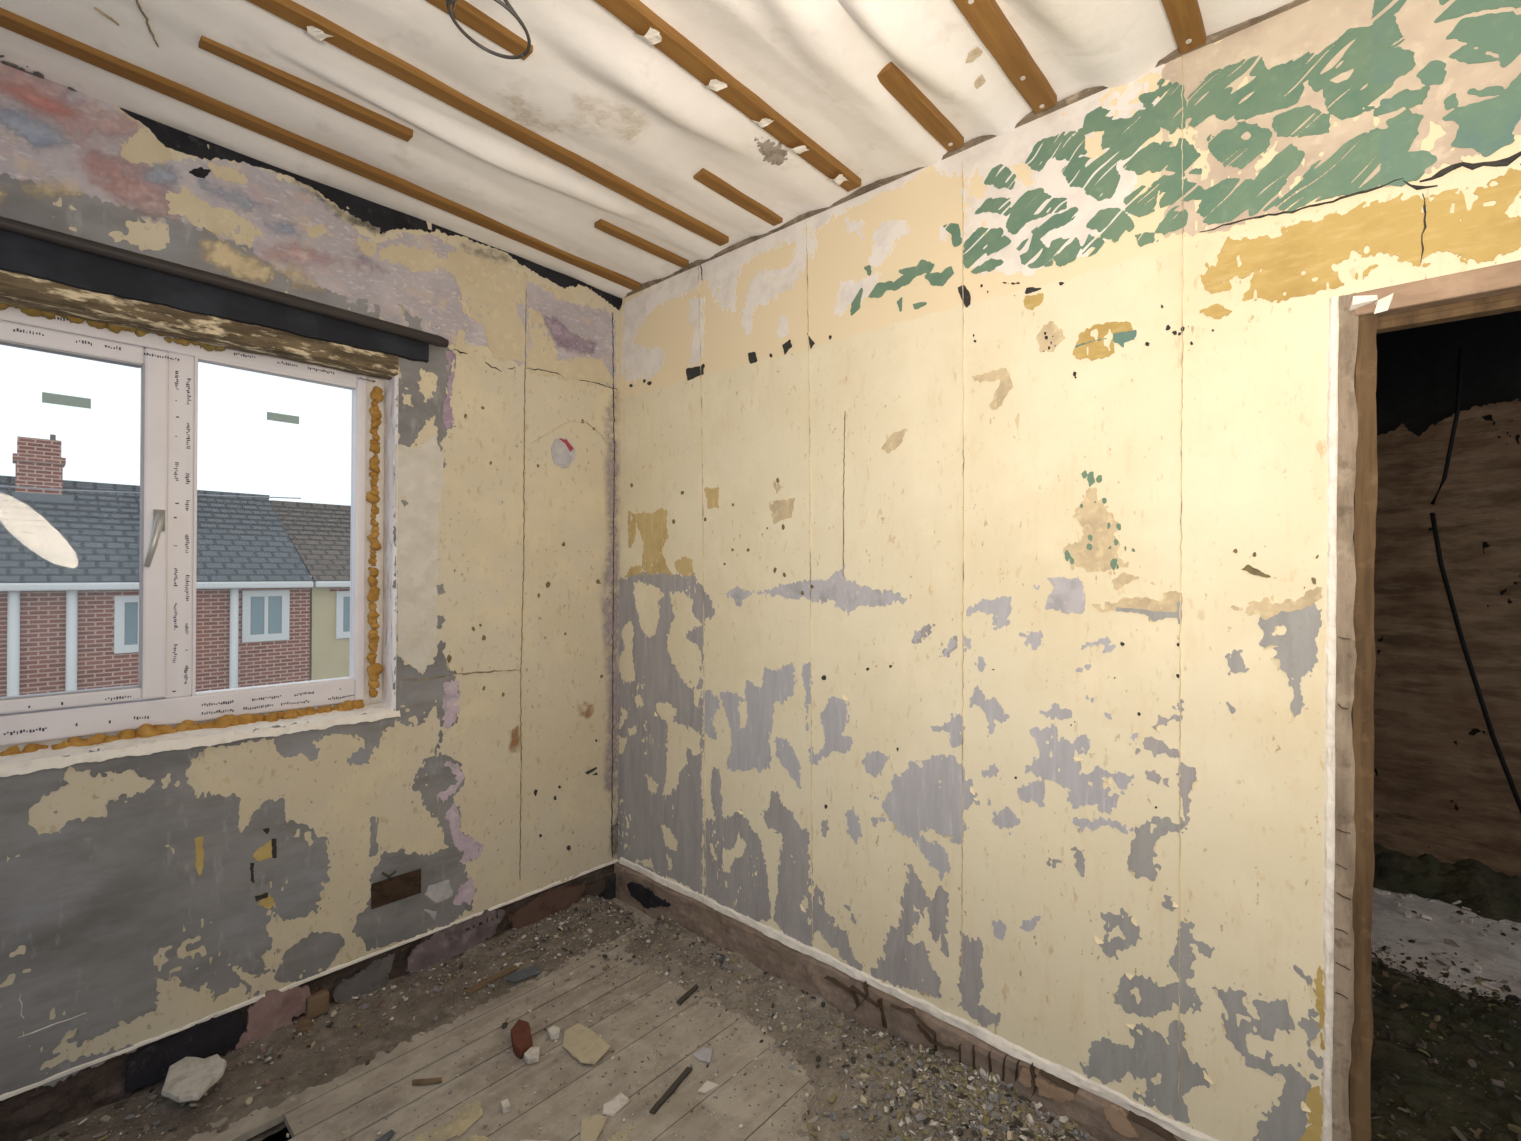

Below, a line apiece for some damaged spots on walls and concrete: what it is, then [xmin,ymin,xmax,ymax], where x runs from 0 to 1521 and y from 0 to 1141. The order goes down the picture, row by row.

flaking render [0,0,1521,469]
peeling [392,500,408,614]
peeling [1233,549,1271,578]
crack [1127,54,1521,1141]
peeling [0,615,585,1101]
peeling [600,563,1324,1141]